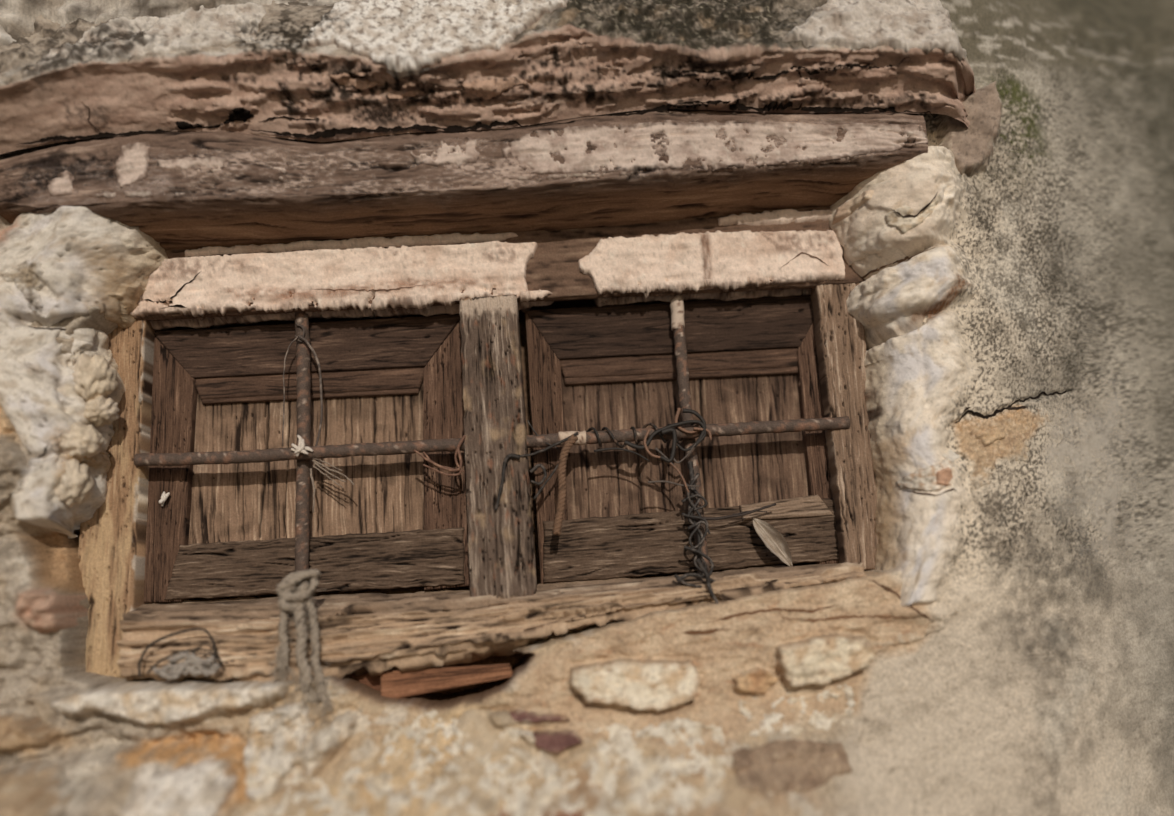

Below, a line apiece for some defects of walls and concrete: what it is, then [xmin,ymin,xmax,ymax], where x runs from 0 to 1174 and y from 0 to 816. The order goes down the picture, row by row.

crack [15,99,178,145]
spalling [3,260,45,313]
crack [955,389,1079,423]
spalling [0,406,80,536]
spalling [896,409,1055,492]